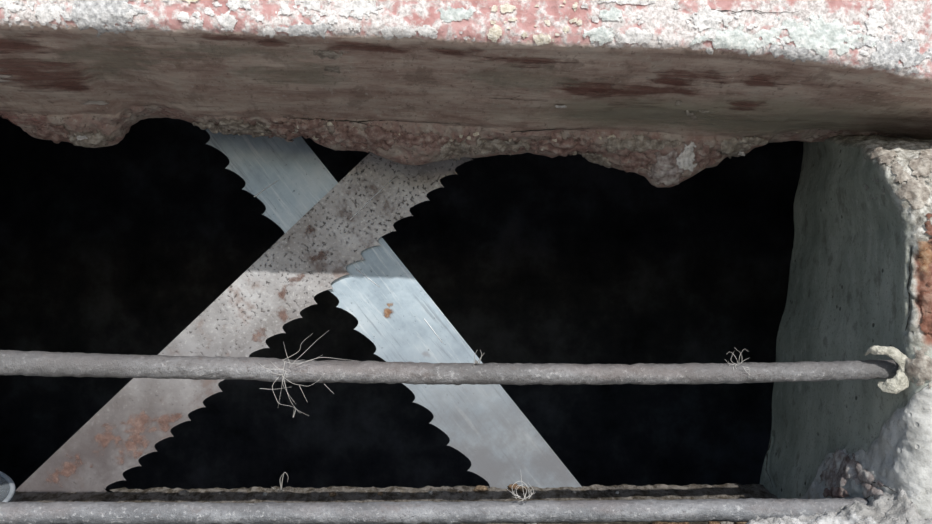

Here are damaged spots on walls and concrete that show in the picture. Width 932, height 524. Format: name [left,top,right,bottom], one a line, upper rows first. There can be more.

damp [0,34,94,91]
peeling [0,0,148,38]
peeling [177,0,383,39]
damp [329,42,406,53]
peeling [379,5,476,42]
damp [432,49,565,68]
peeling [521,0,664,46]
damp [560,71,724,99]
damp [743,75,785,87]
peeling [676,5,932,74]
spalling [31,123,116,149]
spalling [192,115,769,187]